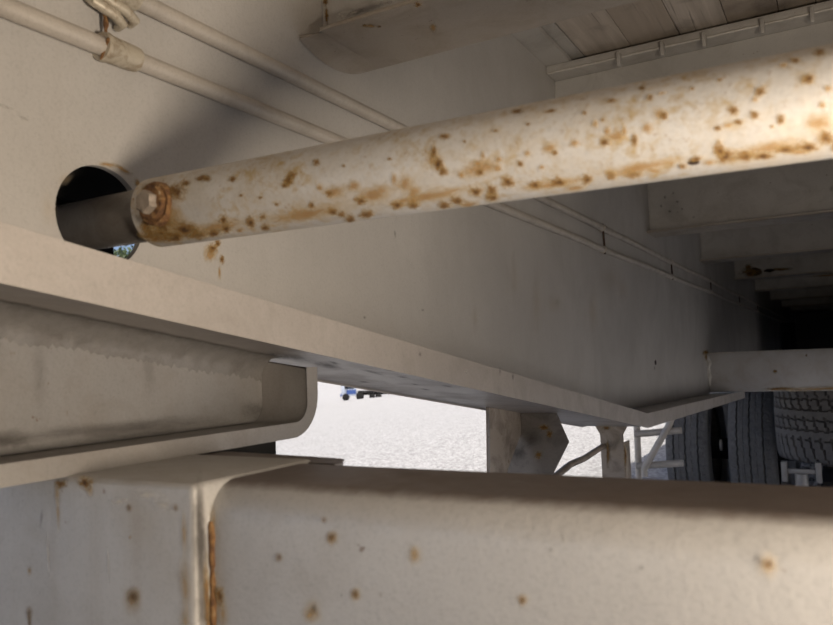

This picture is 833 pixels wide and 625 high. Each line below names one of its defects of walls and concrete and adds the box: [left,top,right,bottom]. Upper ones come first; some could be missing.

rust [594,118,650,147]
rust [715,107,743,131]
rust [706,118,833,164]
rust [169,175,209,199]
rust [282,170,296,187]
rust [430,147,448,176]
rust [392,153,515,210]
rust [529,174,592,191]
rust [606,161,669,180]
rust [278,182,385,223]
rust [140,208,269,276]